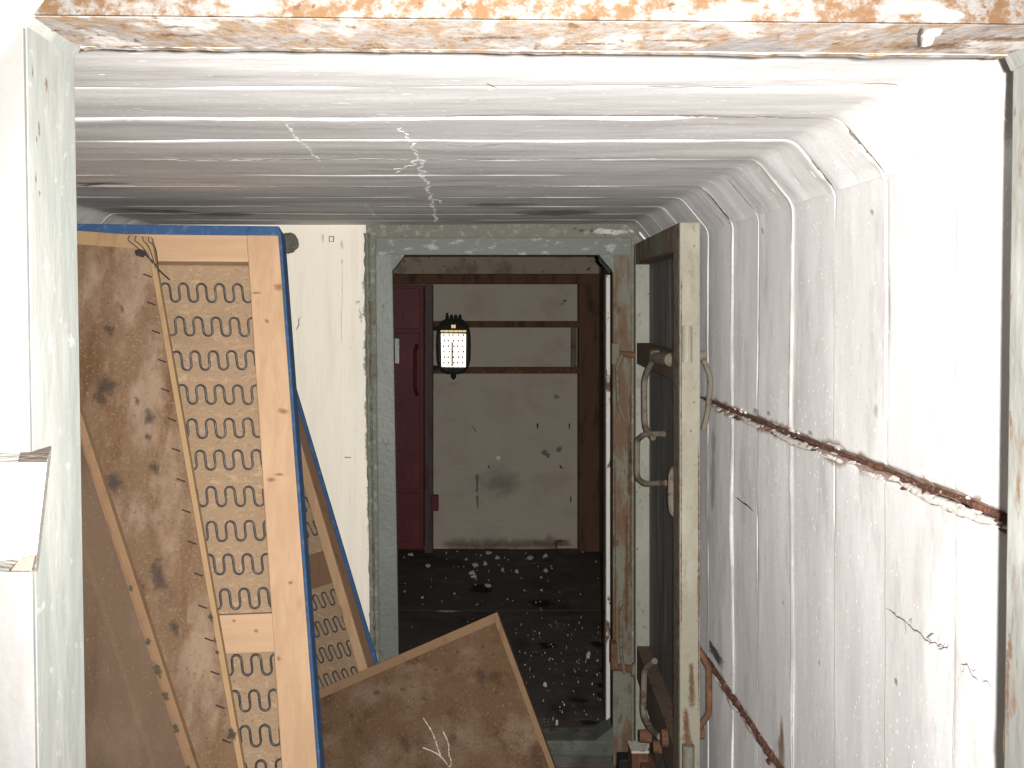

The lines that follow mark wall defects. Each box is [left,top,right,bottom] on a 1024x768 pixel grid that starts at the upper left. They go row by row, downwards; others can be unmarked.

corrosion [861,33,1024,56]
crack [87,125,580,222]
spalling [700,260,1007,768]
crack [884,558,991,768]